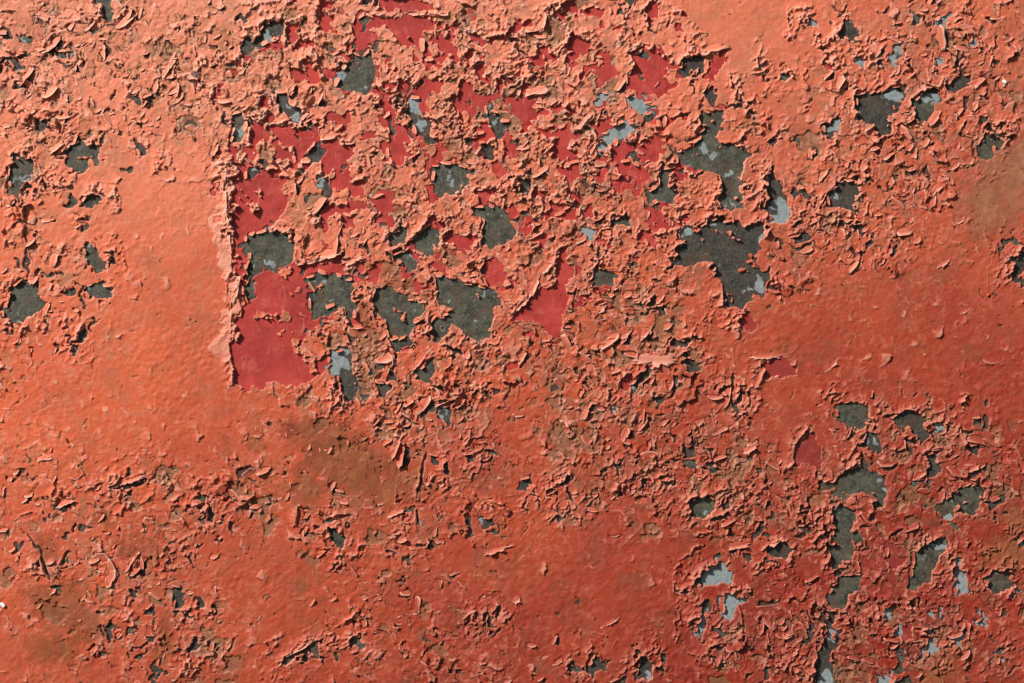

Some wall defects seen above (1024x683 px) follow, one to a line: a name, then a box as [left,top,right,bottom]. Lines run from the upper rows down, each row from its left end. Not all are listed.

peeling [0,0,147,220]
peeling [129,19,299,140]
peeling [0,239,114,355]
peeling [209,0,1015,683]
peeling [1007,248,1024,288]
peeling [1,448,89,518]
peeling [94,473,152,506]
peeling [187,466,291,547]
peeling [60,514,225,683]
peeling [187,636,232,653]